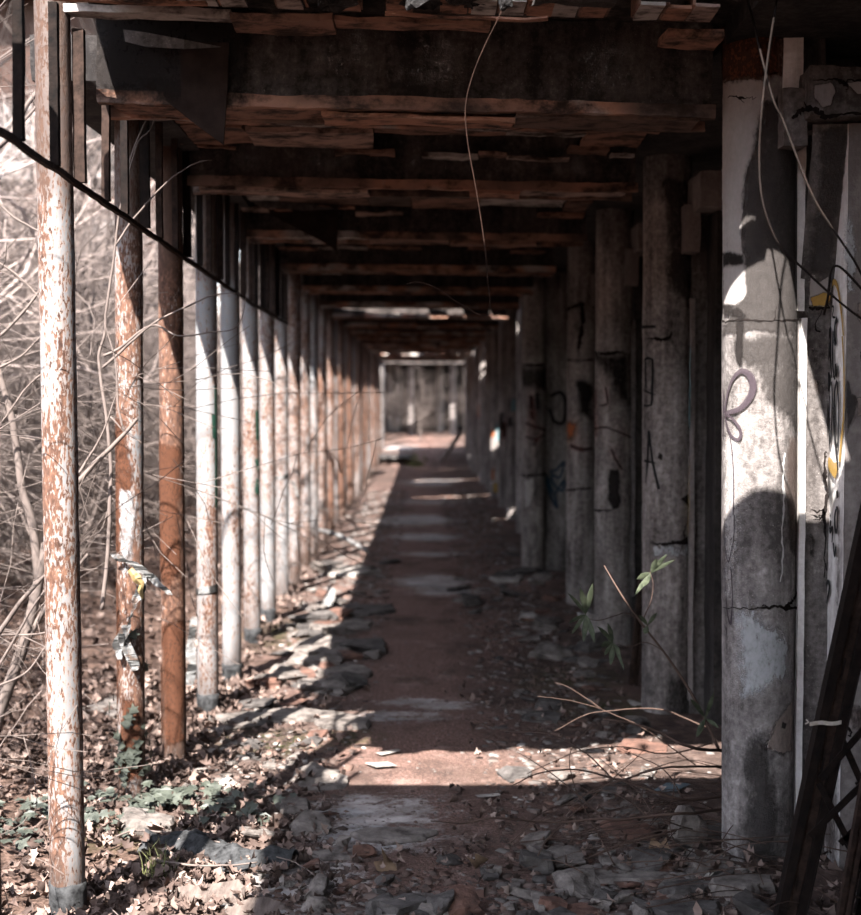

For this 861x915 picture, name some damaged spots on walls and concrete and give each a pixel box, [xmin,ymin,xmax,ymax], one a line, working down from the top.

peeling [813,82,836,108]
leakage [722,98,798,582]
rust [115,416,134,554]
rust [159,441,181,587]
crack [723,593,797,611]
rust [161,620,185,747]
leakage [742,733,782,862]